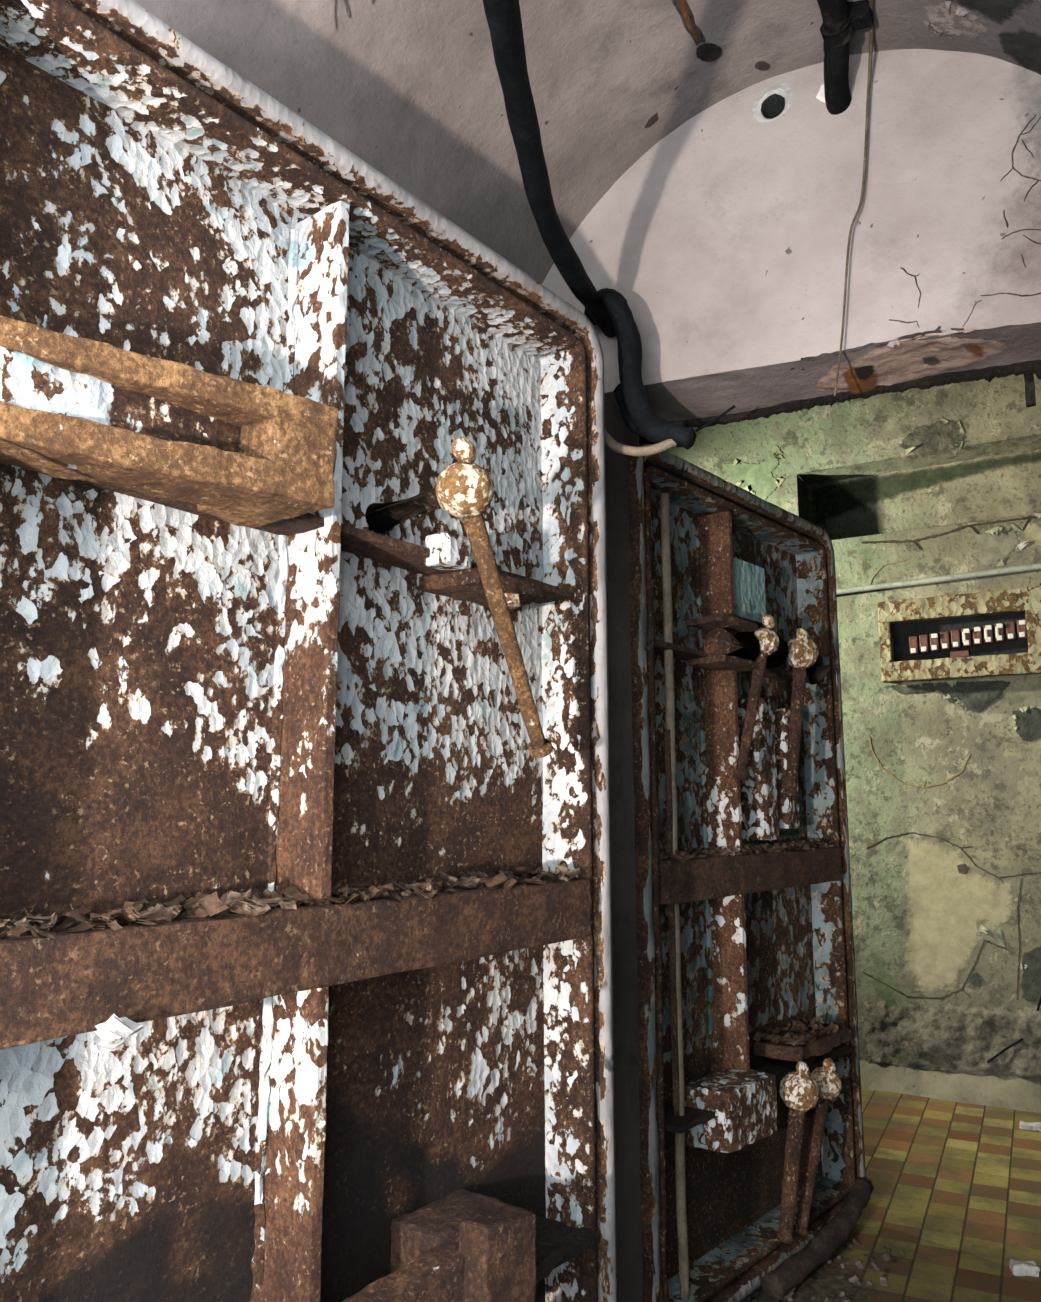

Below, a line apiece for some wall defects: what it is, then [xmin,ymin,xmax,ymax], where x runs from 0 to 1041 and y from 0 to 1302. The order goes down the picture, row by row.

crack [334,0,373,29]
damp [957,0,1030,23]
crack [801,114,1041,361]
rust [964,345,981,357]
rust [842,366,876,394]
rust [659,838,834,863]
rust [0,863,581,941]
spalling [863,839,1041,1082]